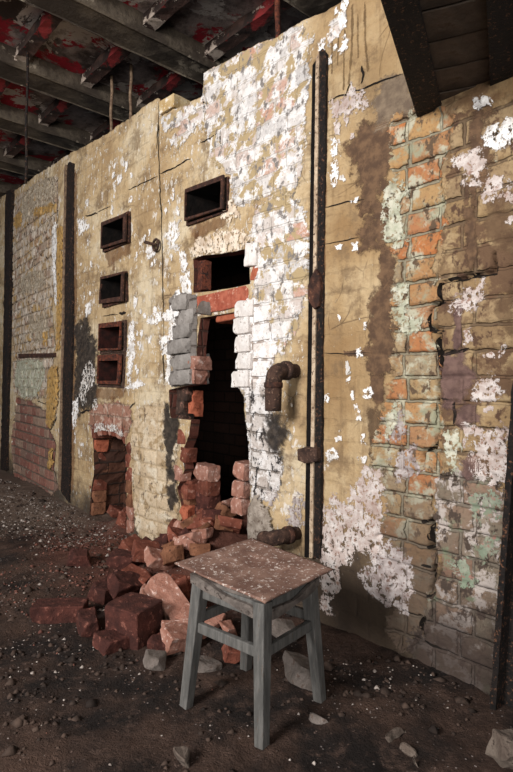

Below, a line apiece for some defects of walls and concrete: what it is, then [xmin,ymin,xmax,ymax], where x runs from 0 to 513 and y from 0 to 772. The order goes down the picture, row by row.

flaking render [11,175,59,496]
water stain [74,314,91,354]
peeling [110,161,132,215]
crack [129,103,189,374]
peeling [124,0,349,507]
peeling [286,492,305,528]
water stain [342,74,417,457]
flaking render [319,81,513,695]
crack [427,262,498,379]